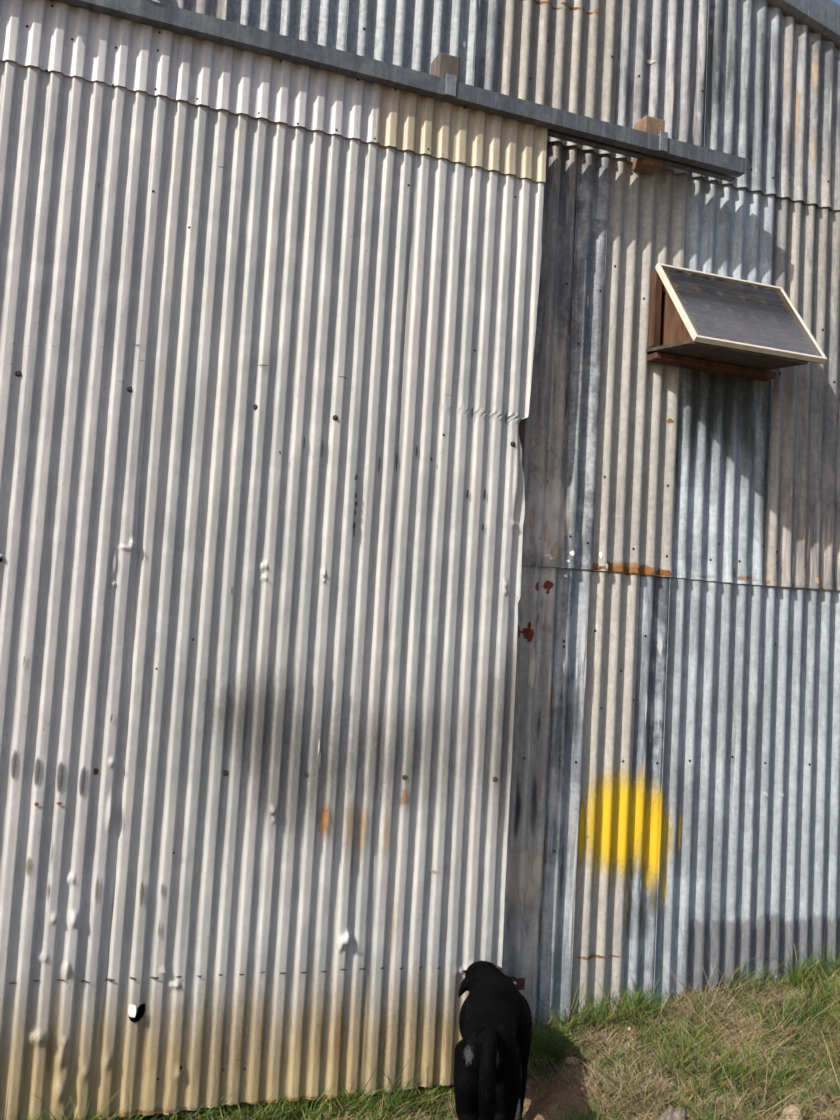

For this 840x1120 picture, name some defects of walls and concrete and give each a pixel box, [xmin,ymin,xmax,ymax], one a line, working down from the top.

corrosion [522,0,599,14]
leakage [676,369,771,515]
corrosion [591,561,671,578]
leakage [778,482,840,591]